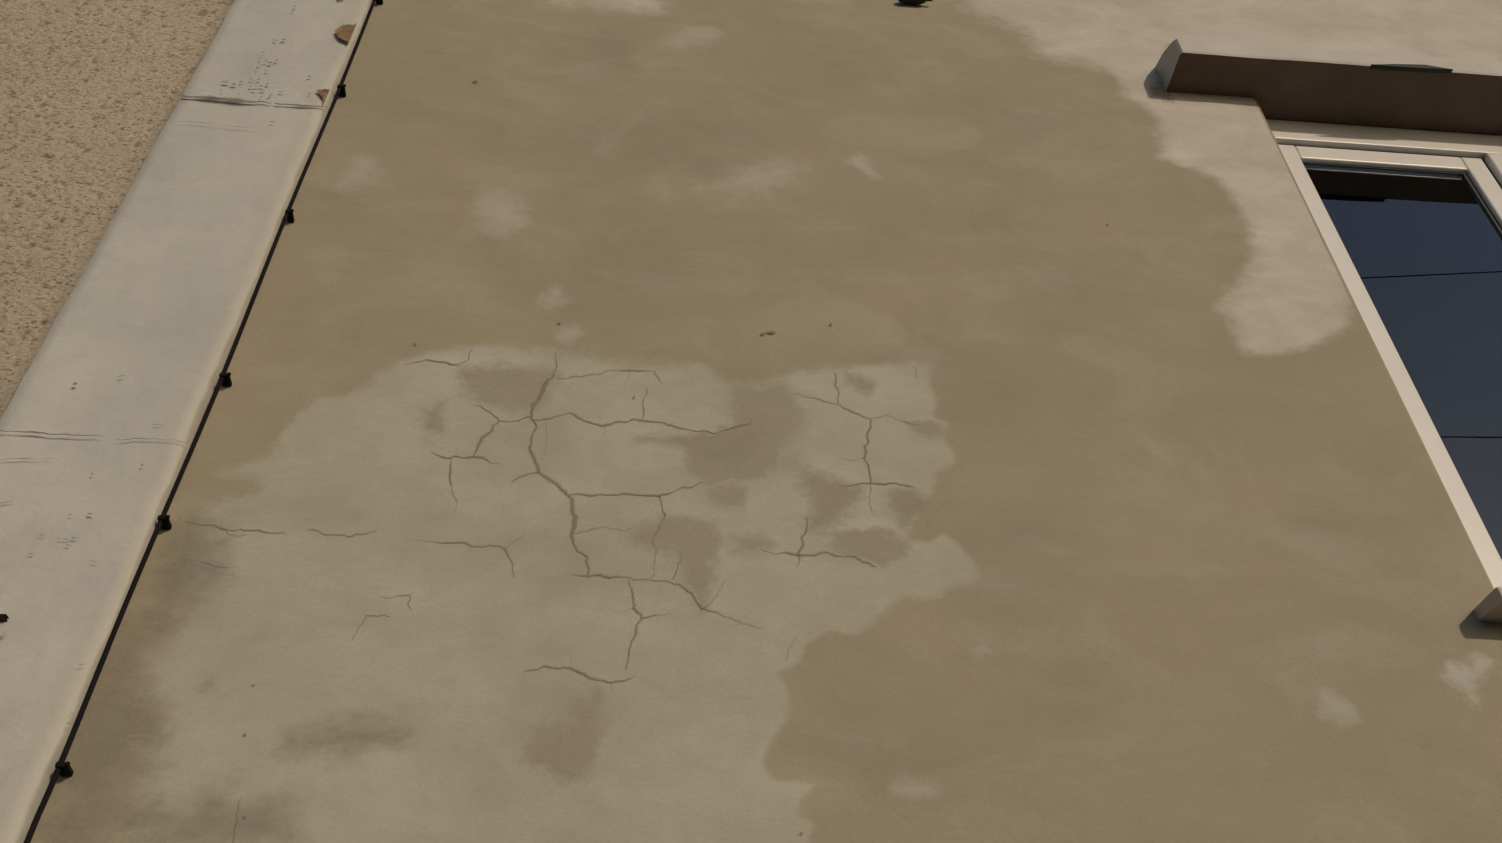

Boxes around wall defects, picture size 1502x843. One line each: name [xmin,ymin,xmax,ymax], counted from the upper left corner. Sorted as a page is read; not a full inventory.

leakage [518,0,735,59]
leakage [444,176,547,249]
leakage [670,146,889,213]
leakage [925,0,1502,364]
crack [411,348,473,365]
crack [796,372,922,511]
crack [185,520,377,567]
leakage [30,278,988,843]
crack [424,353,756,689]
crack [761,517,876,567]
leakage [1302,677,1373,737]